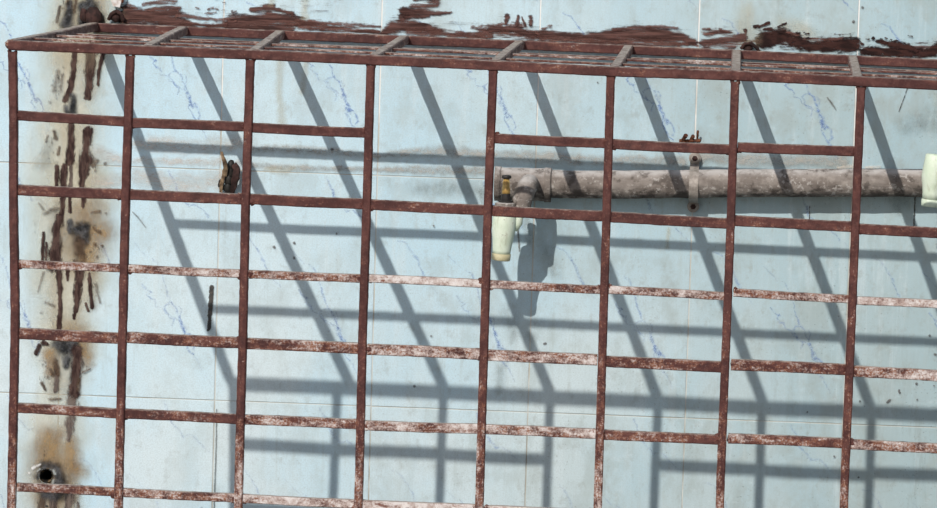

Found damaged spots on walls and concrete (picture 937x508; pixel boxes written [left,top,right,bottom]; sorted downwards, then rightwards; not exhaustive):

corrosion [56,0,95,39]
corrosion [40,197,109,272]
corrosion [34,340,91,406]
spalling [39,468,54,483]
corrosion [28,415,81,508]